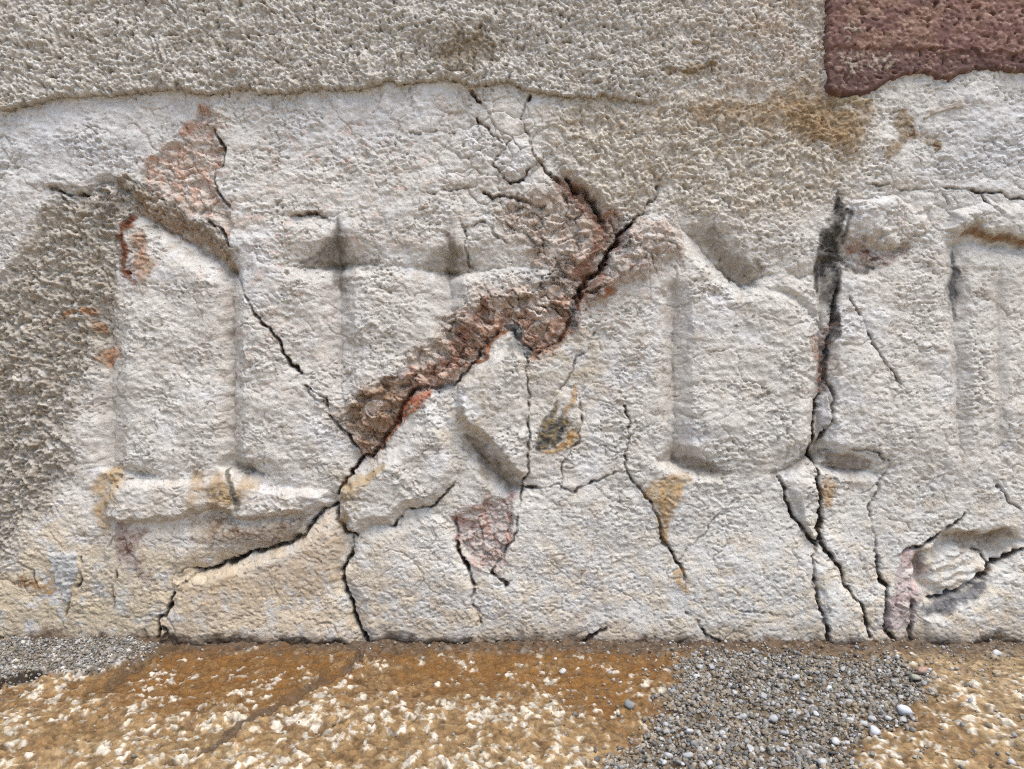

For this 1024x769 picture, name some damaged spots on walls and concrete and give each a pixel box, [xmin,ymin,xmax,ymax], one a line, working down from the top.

spalling [0,104,236,554]
crack [213,135,230,238]
spalling [338,183,684,456]
crack [483,164,650,342]
leakage [814,191,874,382]
crack [159,592,176,638]
crack [197,313,532,756]
spalling [452,491,515,571]
crack [630,478,682,569]
crack [778,284,1023,640]
spalling [883,546,927,638]